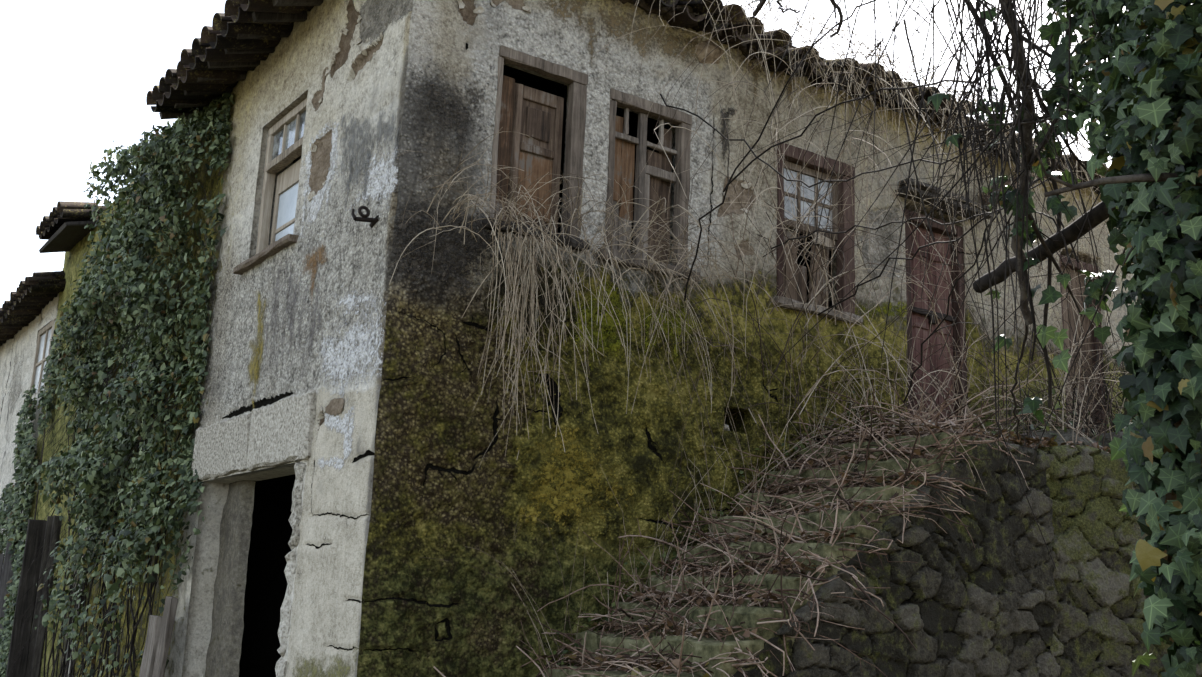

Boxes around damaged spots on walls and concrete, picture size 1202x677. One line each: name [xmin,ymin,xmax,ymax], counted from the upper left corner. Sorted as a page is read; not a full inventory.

flaking render [457,0,531,26]
flaking render [311,0,413,112]
flaking render [307,129,332,201]
water stain [252,267,384,409]
crack [222,392,293,419]
crack [352,450,375,463]
crack [305,439,368,549]